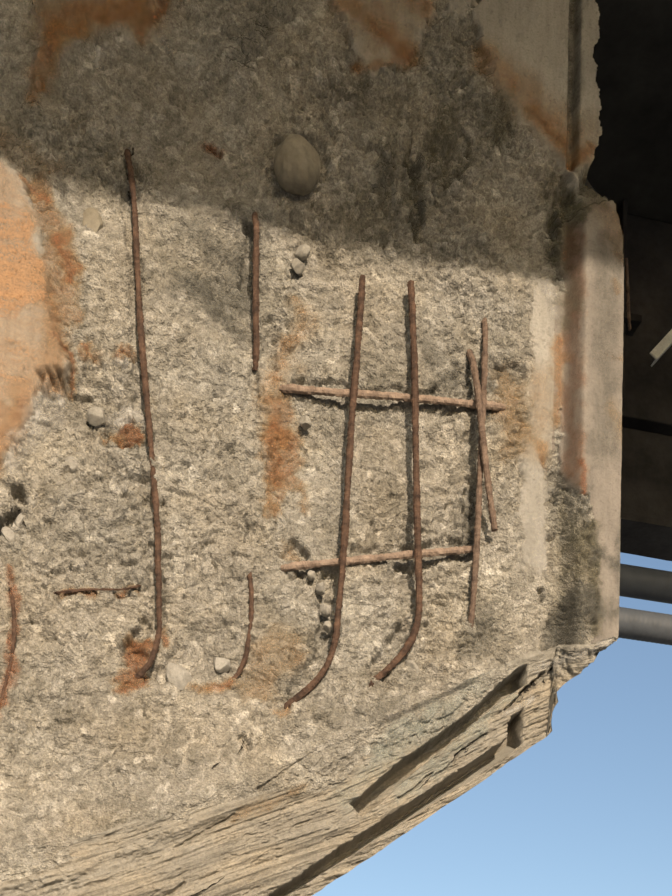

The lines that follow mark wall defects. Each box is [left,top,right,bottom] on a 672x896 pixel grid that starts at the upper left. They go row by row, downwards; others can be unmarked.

corrosion [0,177,96,451]
corrosion [103,421,144,449]
spalling [0,0,554,855]
spalling [530,151,575,306]
spalling [530,396,601,651]
corrosion [113,634,168,693]